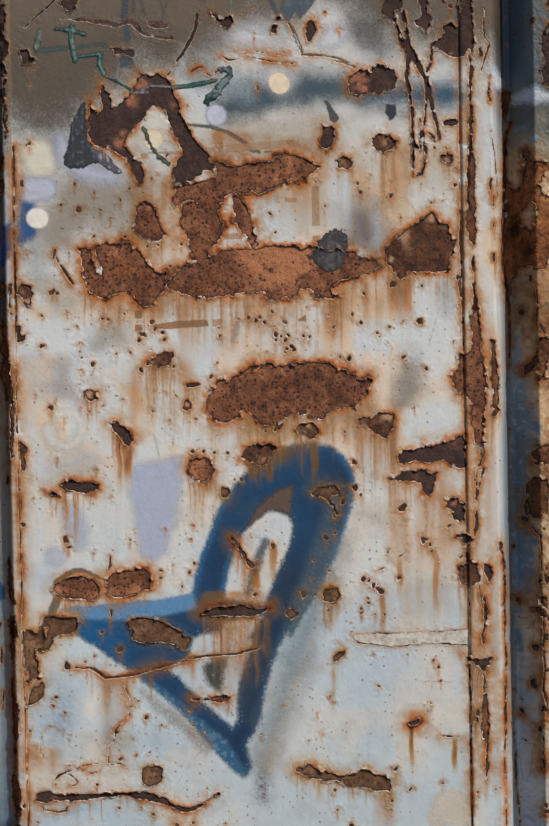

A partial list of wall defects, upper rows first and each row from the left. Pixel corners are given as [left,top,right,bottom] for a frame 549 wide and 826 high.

rust [59,0,80,14]
rust [539,20,549,90]
rust [68,0,501,509]
rust [486,73,549,385]
rust [309,482,362,518]
rust [420,535,440,597]
rust [195,532,277,668]
rust [299,582,343,622]
rust [360,575,386,623]
rust [125,616,192,650]
rust [332,647,347,679]
rust [291,759,398,811]